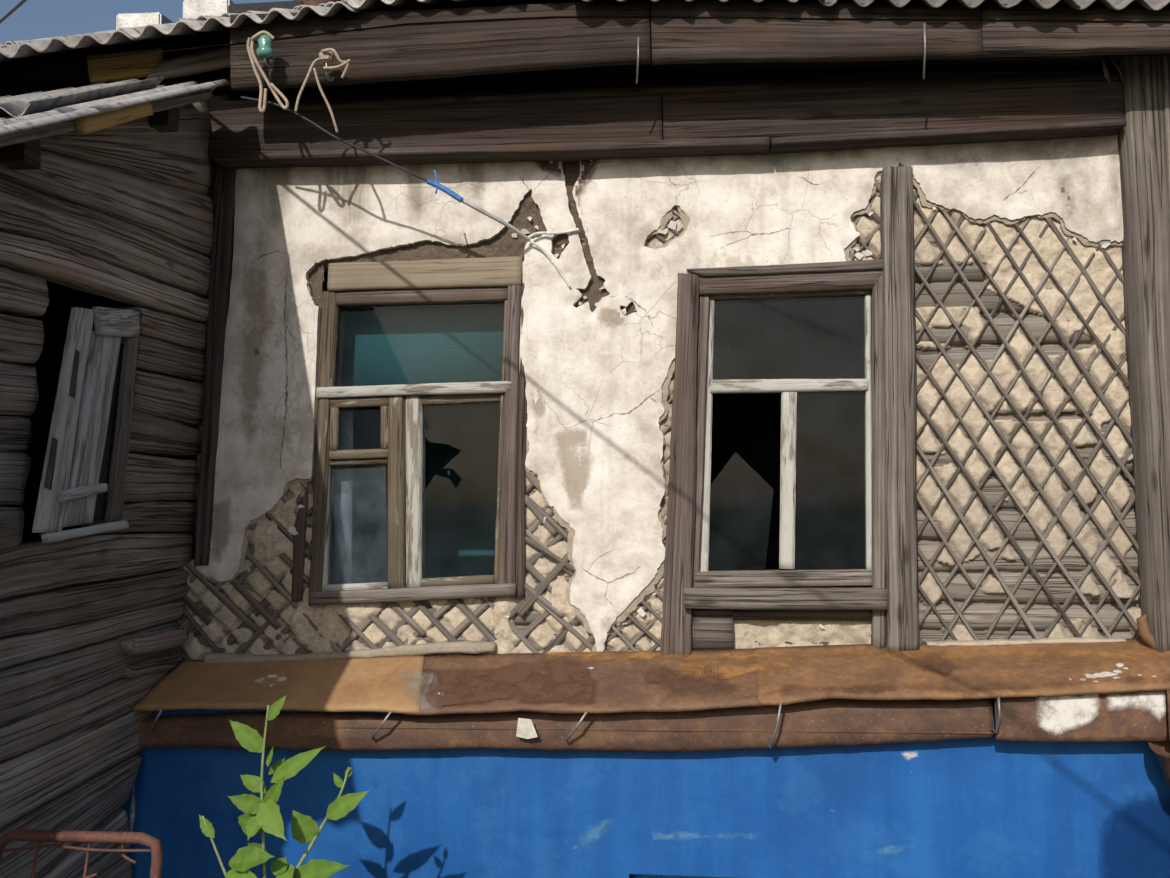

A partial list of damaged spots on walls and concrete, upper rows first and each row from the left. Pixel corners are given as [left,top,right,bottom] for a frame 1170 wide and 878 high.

spalling [308,162,610,314]
spalling [645,207,684,248]
spalling [846,175,881,261]
crack [252,248,310,469]
spalling [913,186,1141,643]
spalling [172,470,665,660]
rust [422,652,611,707]
rust [628,652,790,691]
spalling [691,620,871,650]